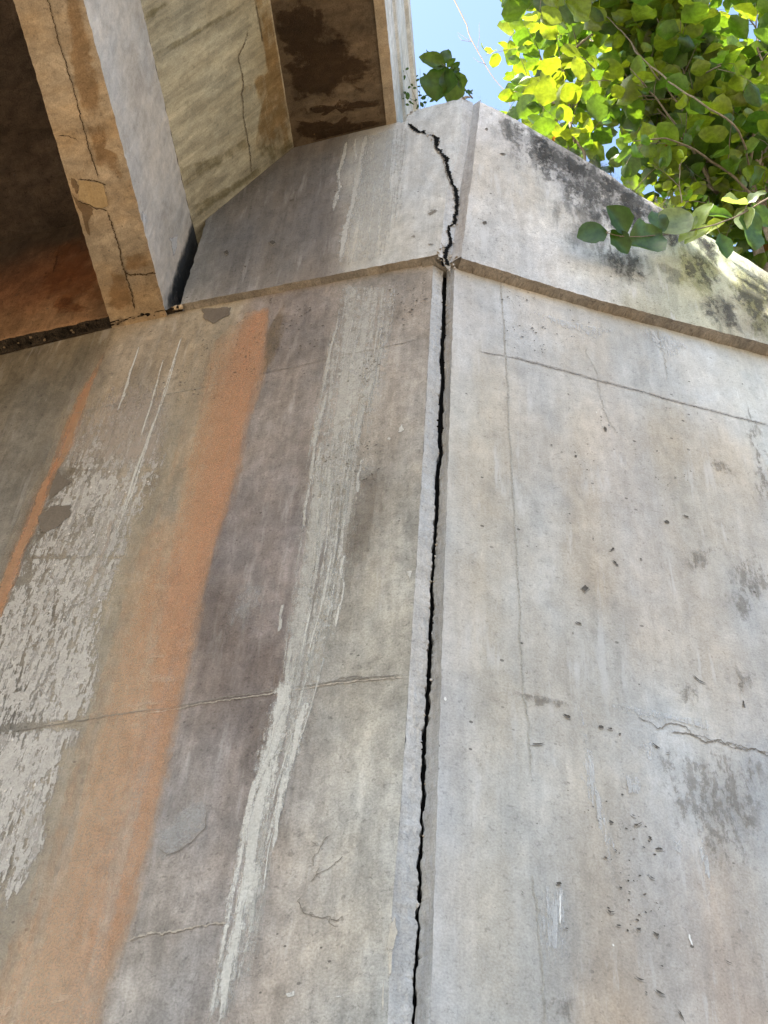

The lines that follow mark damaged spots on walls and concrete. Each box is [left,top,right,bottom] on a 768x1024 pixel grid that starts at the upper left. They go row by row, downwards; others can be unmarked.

spalling [78,180,108,208]
crack [47,0,156,309]
crack [238,5,263,172]
damp [514,123,662,227]
damp [608,253,644,280]
damp [683,237,768,330]
corrosion [0,370,97,618]
peeling [0,339,211,908]
crack [1,123,460,1024]
damp [210,286,394,1019]
crack [481,282,768,786]